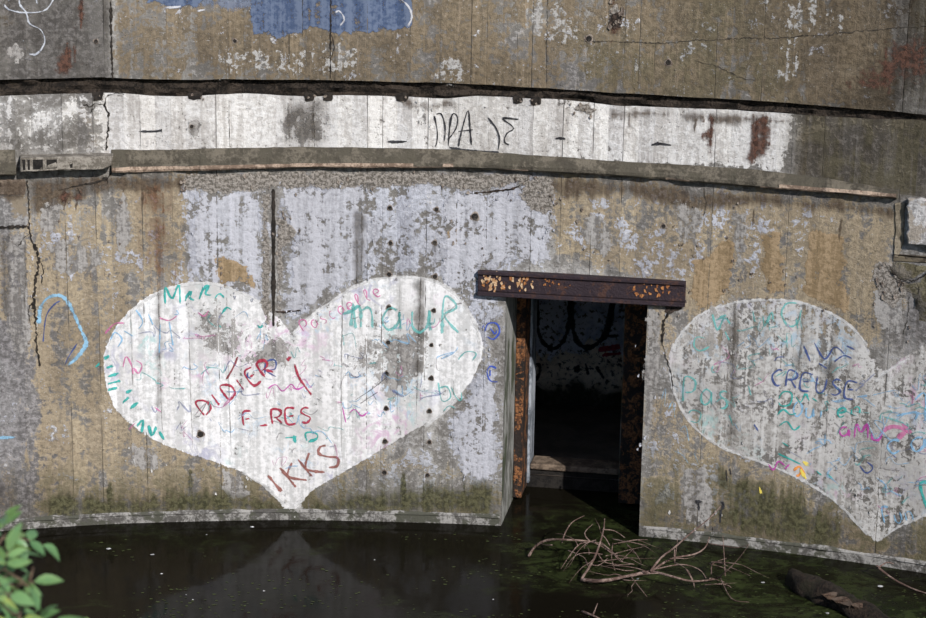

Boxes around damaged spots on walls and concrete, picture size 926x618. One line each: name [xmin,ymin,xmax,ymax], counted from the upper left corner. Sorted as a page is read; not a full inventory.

rust [746,115,771,163]
crack [62,171,112,192]
crack [0,180,44,366]